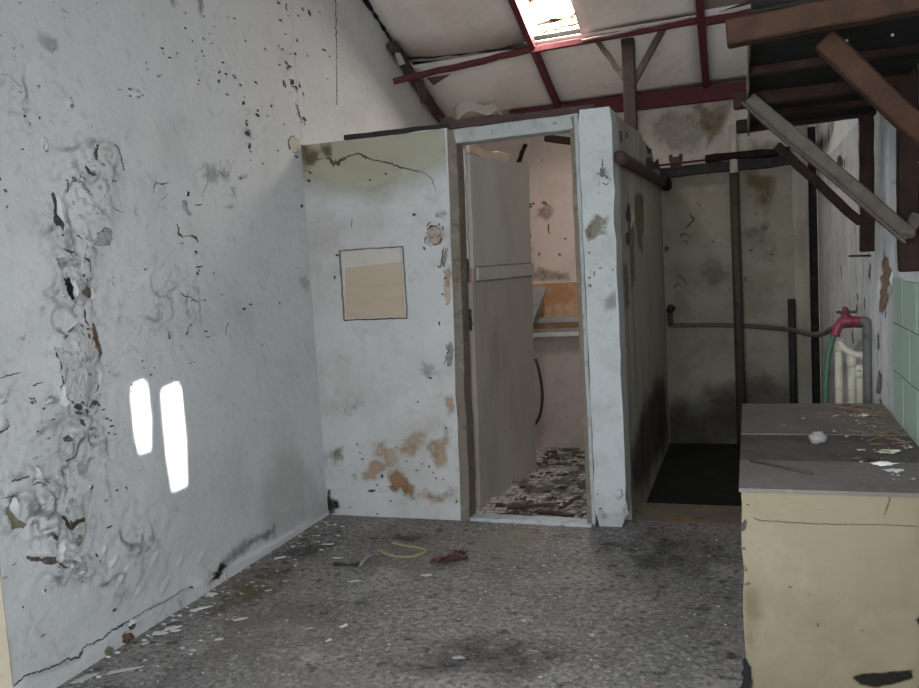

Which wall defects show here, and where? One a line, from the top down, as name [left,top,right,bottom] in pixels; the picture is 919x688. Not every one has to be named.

crack [311,152,436,191]
spalling [423,210,451,306]
leakage [624,195,644,304]
spalling [29,248,116,439]
spalling [444,341,454,366]
spalling [2,495,93,583]
crack [13,589,184,687]